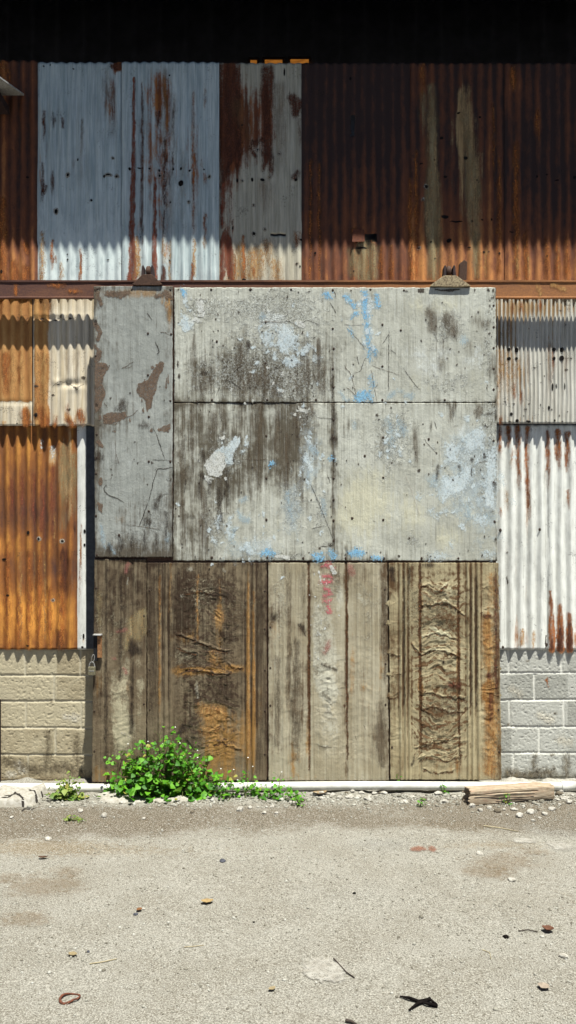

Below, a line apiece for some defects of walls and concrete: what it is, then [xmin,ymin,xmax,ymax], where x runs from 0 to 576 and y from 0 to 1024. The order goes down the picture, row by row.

corrosion [95,77,174,314]
corrosion [191,99,207,280]
corrosion [219,63,281,280]
corrosion [349,228,394,280]
corrosion [410,65,442,280]
corrosion [473,105,570,309]
peeling [129,361,180,412]
peeling [178,289,359,501]
corrosion [497,417,530,507]
corrosion [545,429,571,485]
corrosion [4,469,82,650]
corrosion [548,591,573,654]